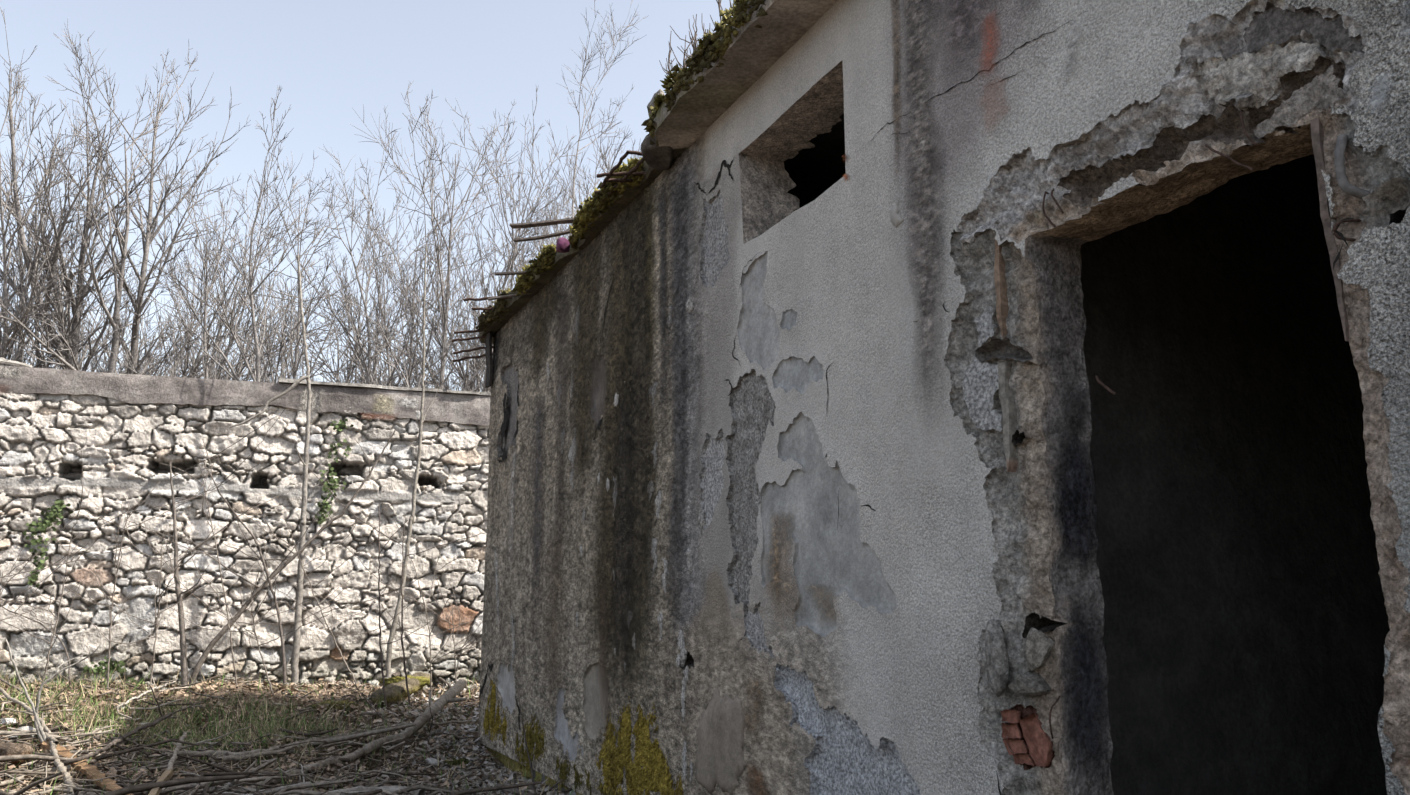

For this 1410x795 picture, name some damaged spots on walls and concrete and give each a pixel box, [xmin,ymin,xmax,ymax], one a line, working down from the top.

crack [862,12,1084,149]
peeling [699,190,731,287]
leakage [893,0,941,374]
peeling [597,473,618,516]
leakage [532,177,687,708]
peeling [649,442,662,519]
peeling [686,251,920,795]
spalling [943,0,1410,795]
peeling [651,538,694,722]